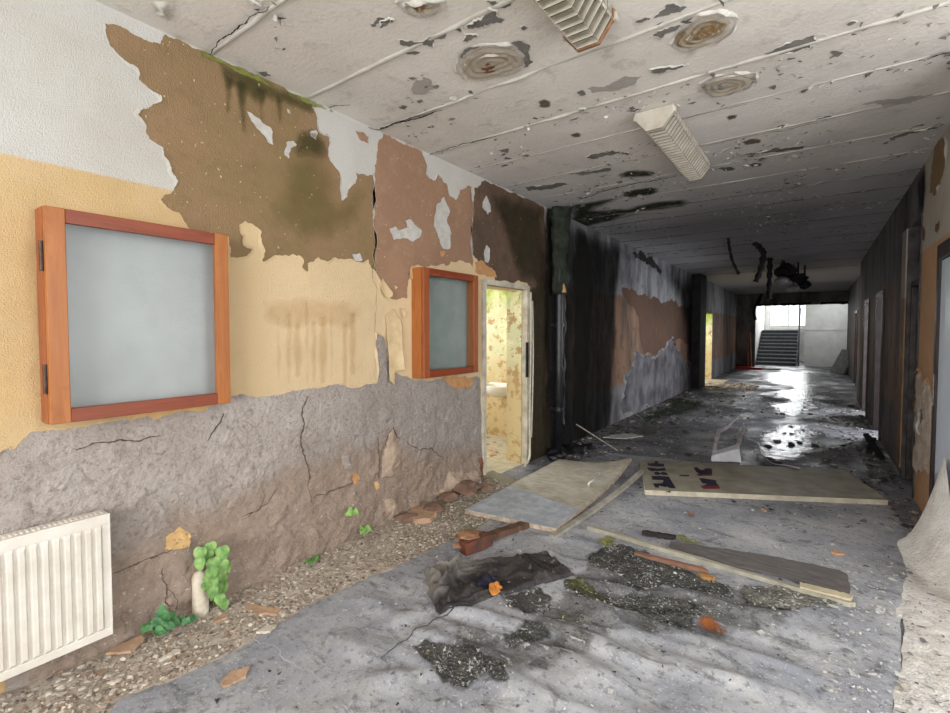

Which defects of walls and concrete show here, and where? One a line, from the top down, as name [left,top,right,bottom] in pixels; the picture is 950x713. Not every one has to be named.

crack [210,6,270,55]
peeling [245,0,287,25]
peeling [370,17,395,28]
peeling [398,0,512,56]
peeling [817,20,932,92]
peeling [698,115,904,253]
water stain [496,188,684,462]
spalling [0,23,723,713]
crack [76,435,160,450]
crack [300,396,444,502]
peeling [497,287,950,713]
crack [113,546,184,613]